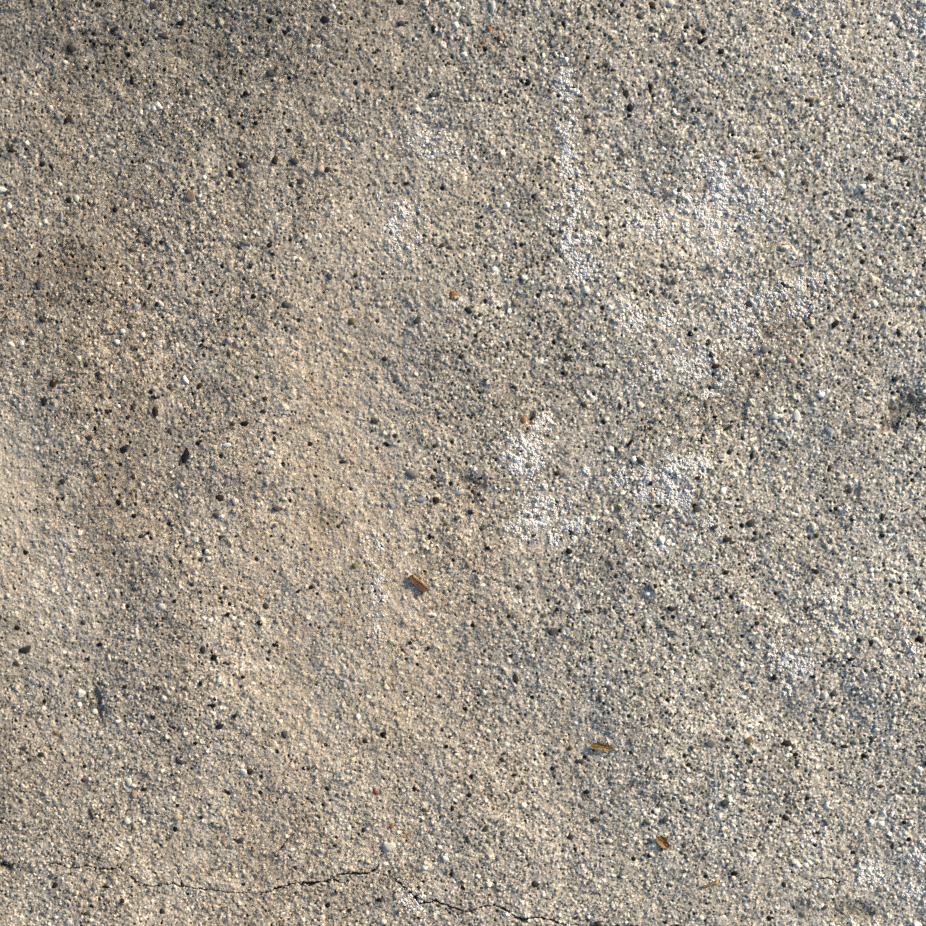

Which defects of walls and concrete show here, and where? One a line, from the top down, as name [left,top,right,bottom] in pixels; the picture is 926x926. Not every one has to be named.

crack [0,850,595,926]